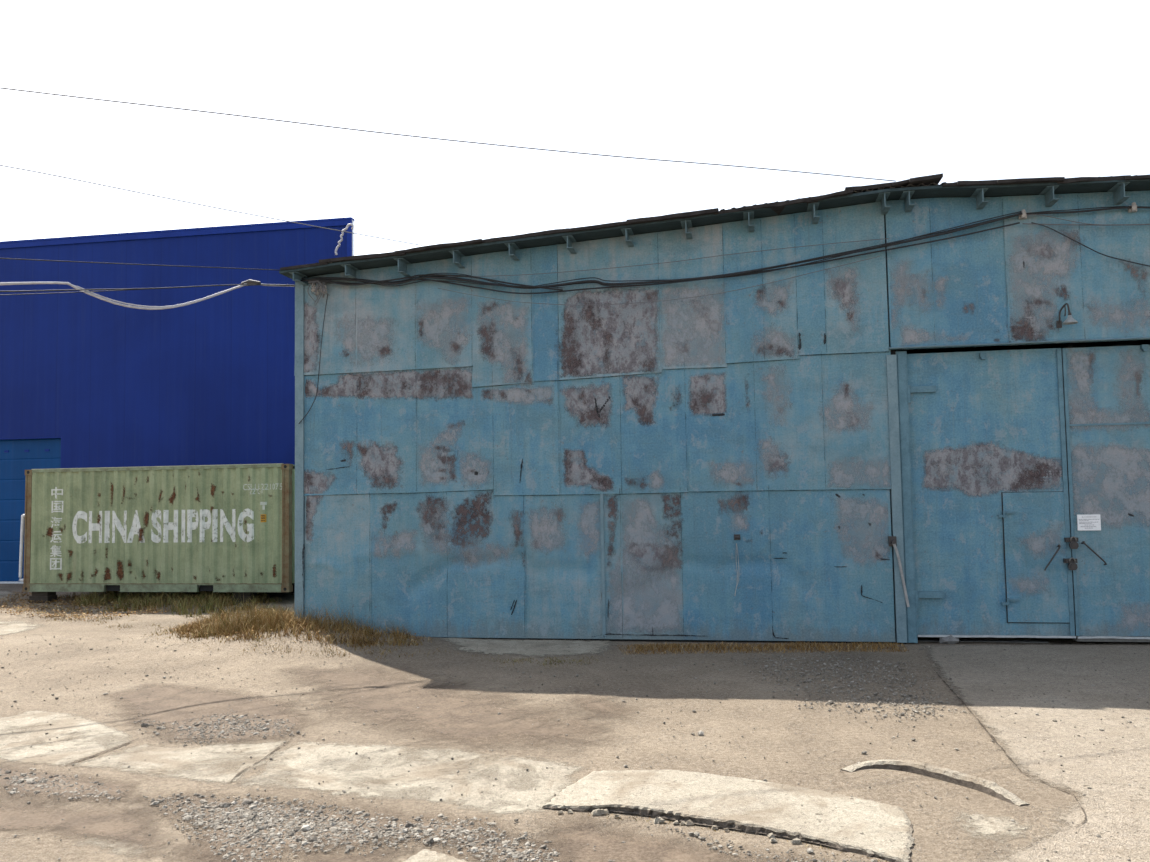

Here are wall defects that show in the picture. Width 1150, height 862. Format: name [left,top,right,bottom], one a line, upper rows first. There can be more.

peeling [1011,232,1075,338]
peeling [304,288,658,426]
peeling [690,373,726,416]
peeling [1069,352,1149,430]
peeling [357,441,401,488]
peeling [924,441,1150,526]
crack [934,670,1087,846]